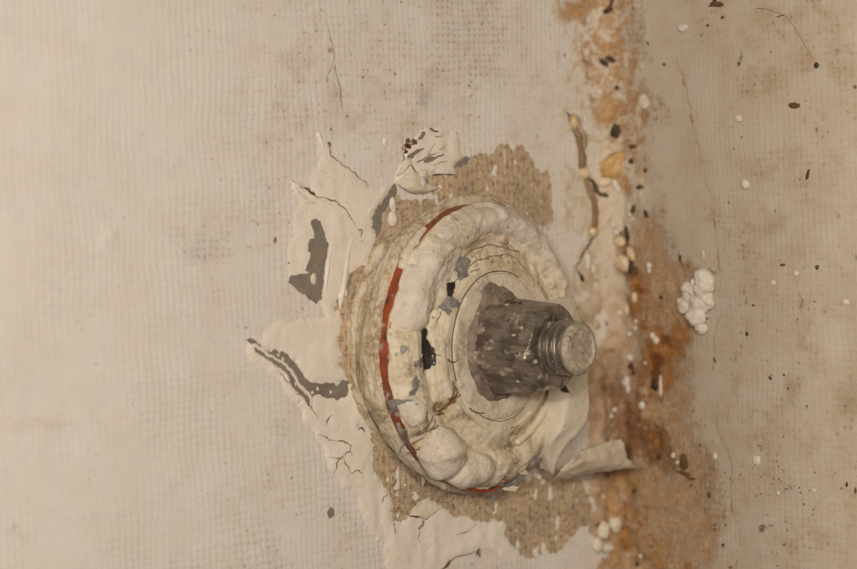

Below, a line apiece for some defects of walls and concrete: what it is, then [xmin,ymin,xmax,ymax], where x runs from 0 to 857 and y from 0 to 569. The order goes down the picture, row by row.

rust [562,0,661,194]
peeling [610,123,622,138]
peeling [245,139,554,413]
peeling [366,423,600,559]
rust [599,232,691,569]